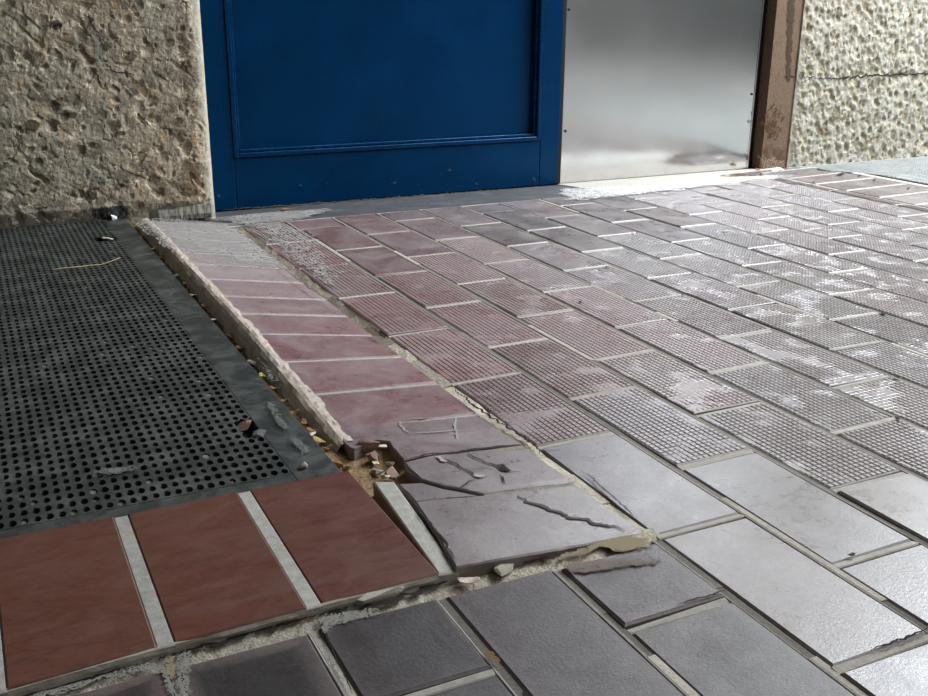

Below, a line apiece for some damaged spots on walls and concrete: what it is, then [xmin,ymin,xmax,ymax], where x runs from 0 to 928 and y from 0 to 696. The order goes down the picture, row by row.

crack [785,72,928,80]
crack [399,390,637,531]
crack [413,501,457,559]
crack [524,556,555,564]
crack [24,581,447,696]